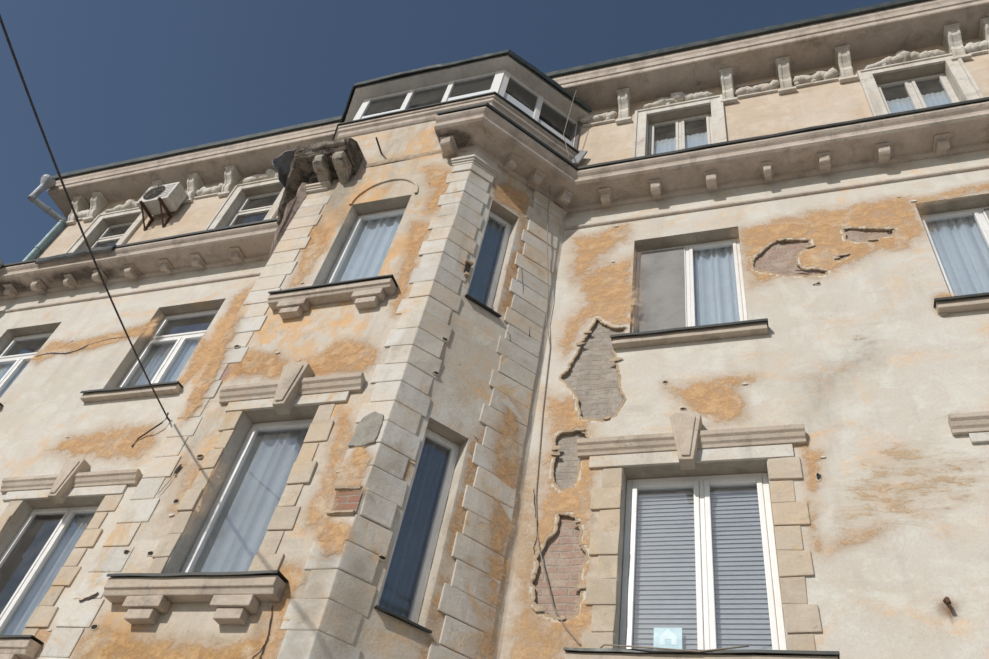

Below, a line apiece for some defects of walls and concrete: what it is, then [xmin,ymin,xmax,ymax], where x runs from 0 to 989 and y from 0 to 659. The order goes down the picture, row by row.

spalling [277,138,364,225]
spalling [464,259,474,278]
peeling [740,184,989,286]
crack [35,336,130,357]
peeling [179,285,376,419]
peeling [56,424,156,460]
peeling [305,414,371,557]
peeling [448,407,522,659]
crack [531,489,539,554]
spalling [529,224,638,647]
peeling [662,375,755,422]
crack [252,606,273,659]